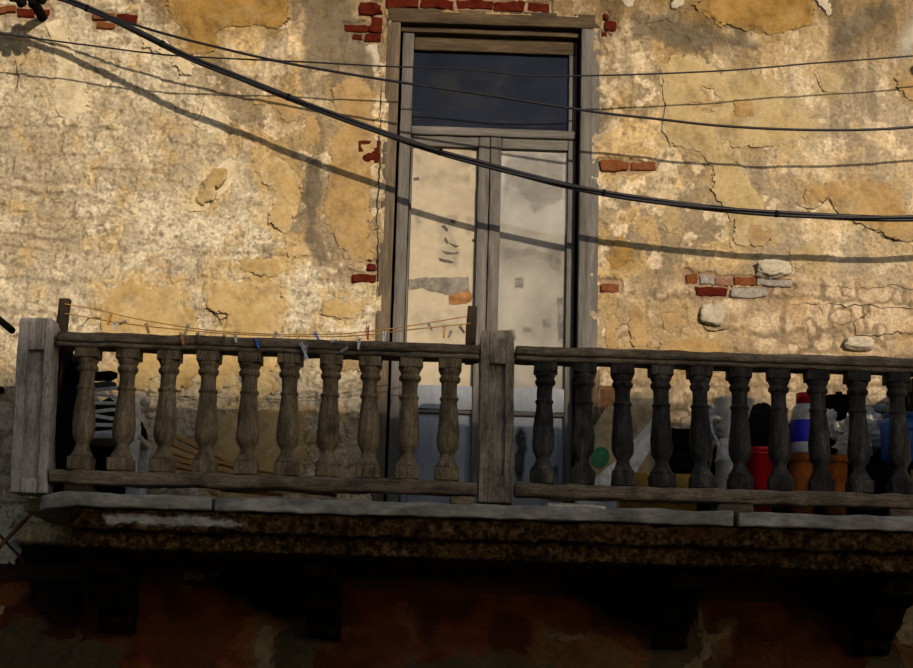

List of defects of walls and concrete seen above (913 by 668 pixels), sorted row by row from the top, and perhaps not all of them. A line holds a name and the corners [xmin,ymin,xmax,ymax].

peeling [141,0,291,76]
flaking render [344,0,549,42]
peeling [324,76,380,283]
crack [795,198,913,248]
peeling [99,277,200,335]
peeling [205,241,316,338]
flaking render [685,273,792,299]
crack [792,284,913,337]
peeling [135,353,161,391]
peeling [175,354,198,391]
peeling [216,355,241,395]
peeling [254,357,281,470]